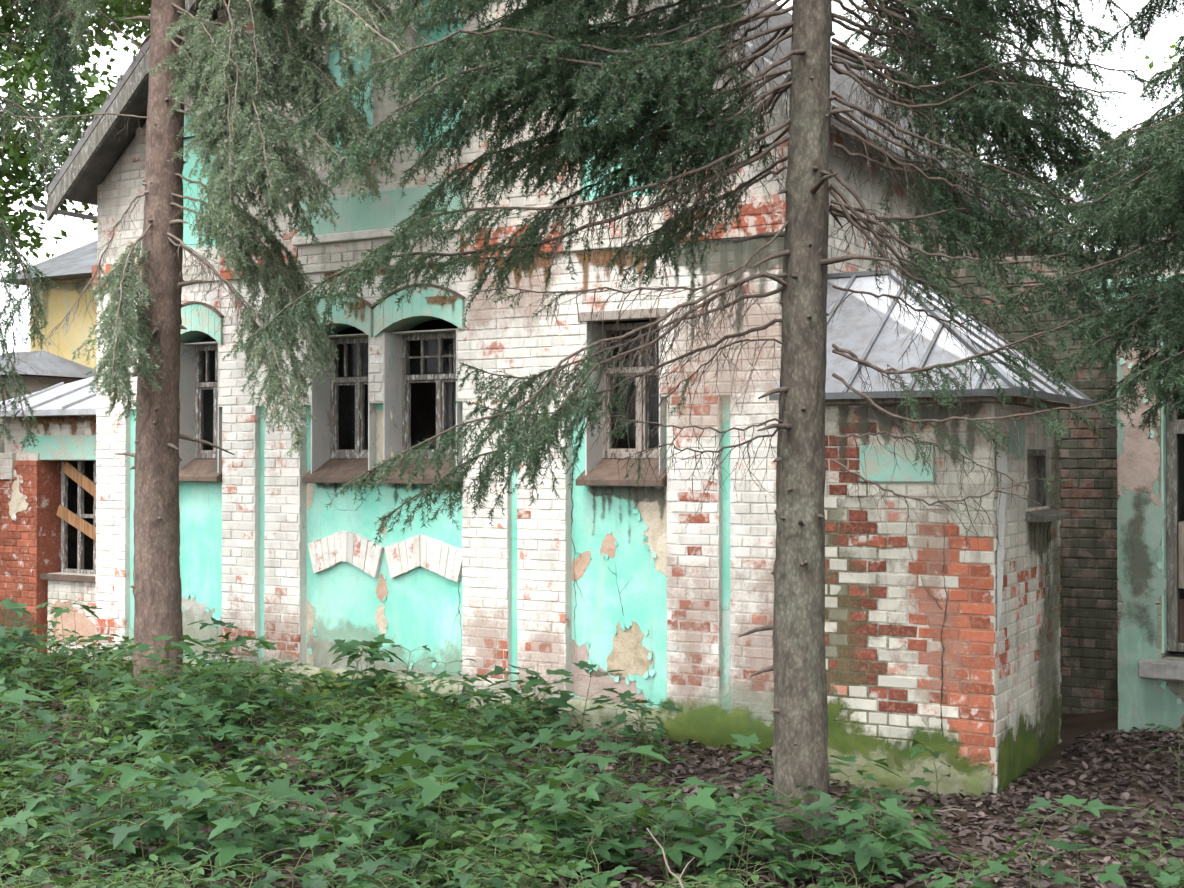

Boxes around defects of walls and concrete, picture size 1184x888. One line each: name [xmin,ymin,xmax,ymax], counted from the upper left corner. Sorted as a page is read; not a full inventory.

spalling [825,422,877,495]
peeling [572,530,618,581]
peeling [633,481,719,576]
leakage [1121,493,1154,640]
peeling [182,592,462,680]
peeling [375,574,388,637]
spalling [477,638,524,690]
spalling [525,642,552,653]
peeling [572,616,656,708]
spalling [667,600,710,632]
spalling [671,654,720,708]
spalling [825,450,1045,775]